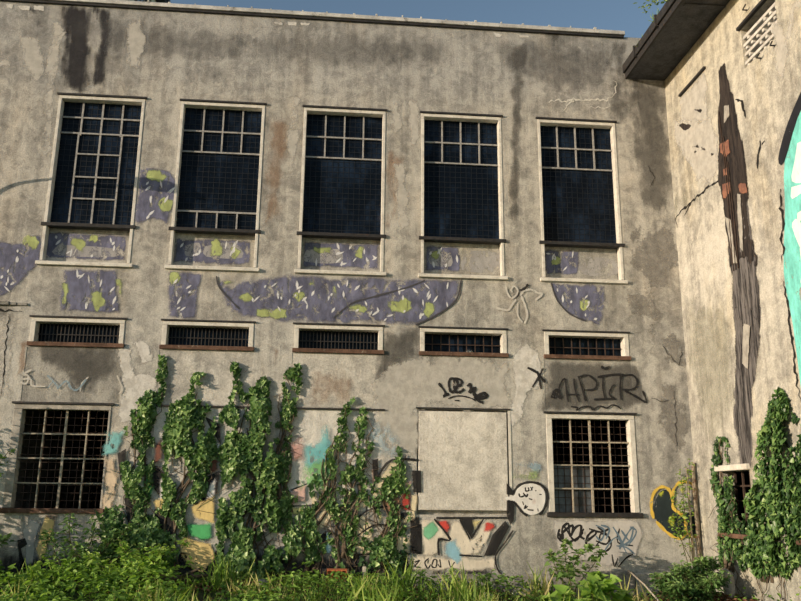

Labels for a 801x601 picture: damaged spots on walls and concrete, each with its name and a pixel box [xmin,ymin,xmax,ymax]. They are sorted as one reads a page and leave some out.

water stain [126,21,145,68]
water stain [20,5,109,155]
water stain [513,48,526,134]
crack [549,80,617,110]
water stain [510,160,518,214]
crack [0,308,22,399]
water stain [41,346,111,383]